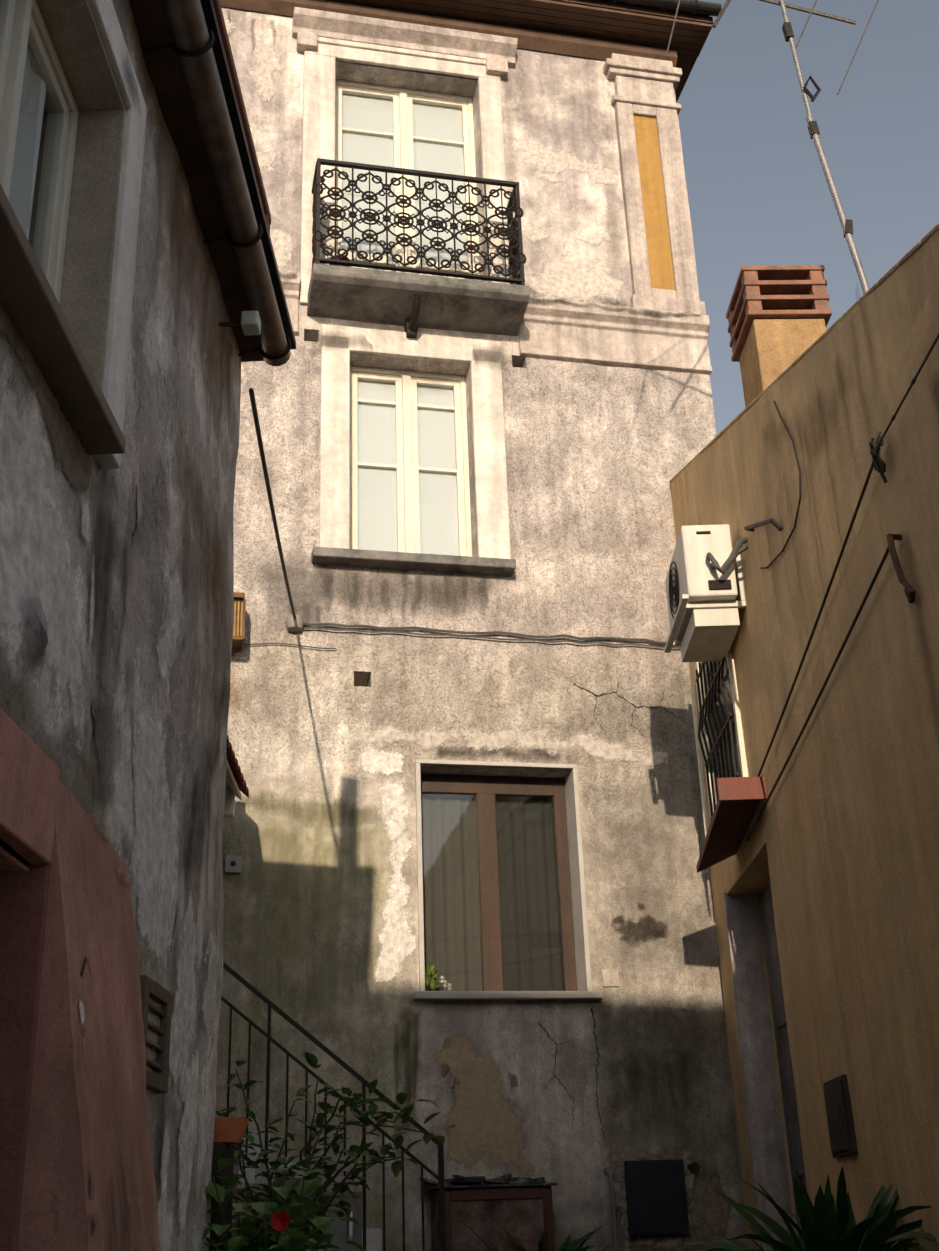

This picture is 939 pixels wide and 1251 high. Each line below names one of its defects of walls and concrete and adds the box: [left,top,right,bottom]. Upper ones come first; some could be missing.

crack [574,676,687,742]
flaking render [361,749,417,983]
crack [538,1008,611,1138]